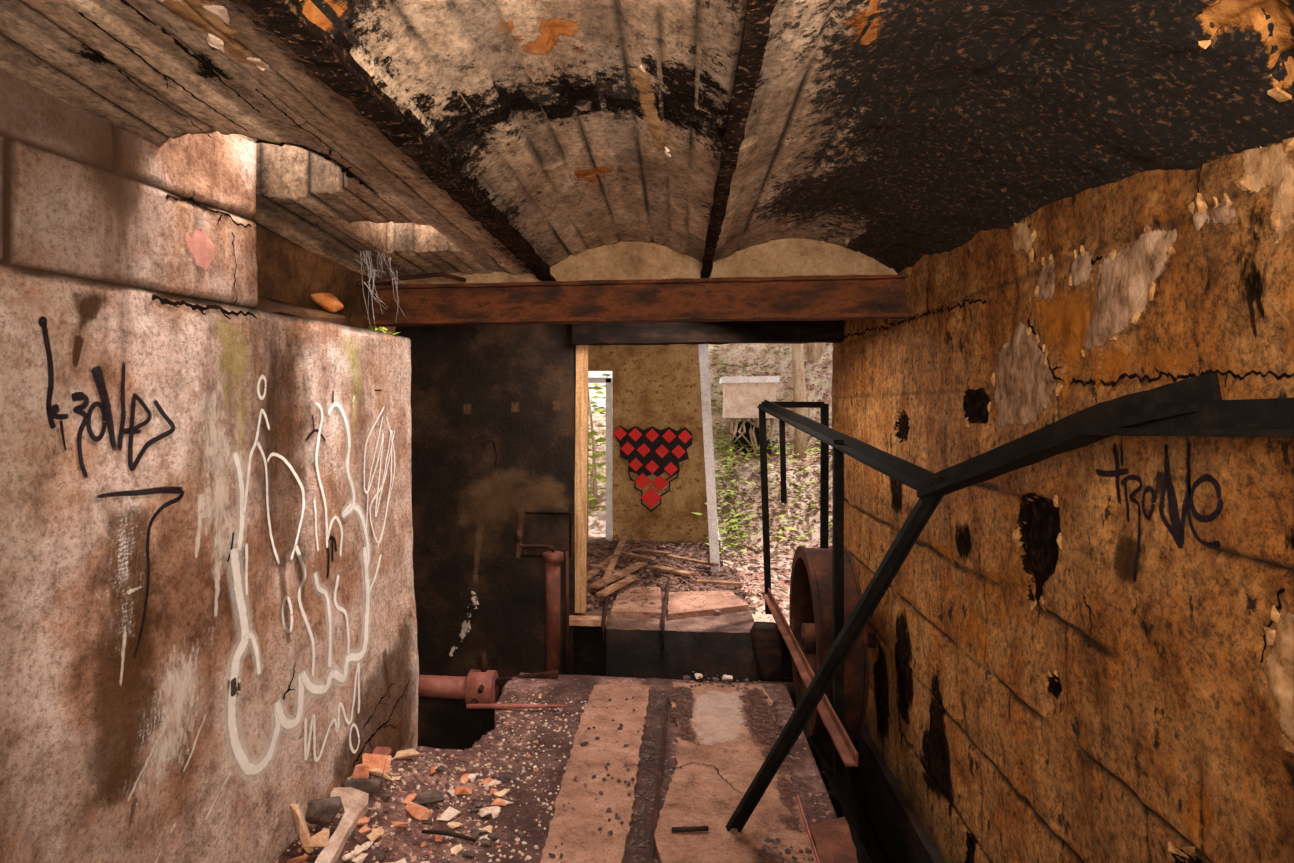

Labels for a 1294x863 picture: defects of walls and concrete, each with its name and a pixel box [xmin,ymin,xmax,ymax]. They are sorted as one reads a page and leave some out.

spalling [1196,0,1294,102]
flaking render [1188,137,1294,244]
crack [844,298,988,338]
flaking render [1013,222,1178,357]
crack [1028,319,1294,388]
damp [461,472,564,582]
damp [873,612,914,754]
damp [919,670,953,816]